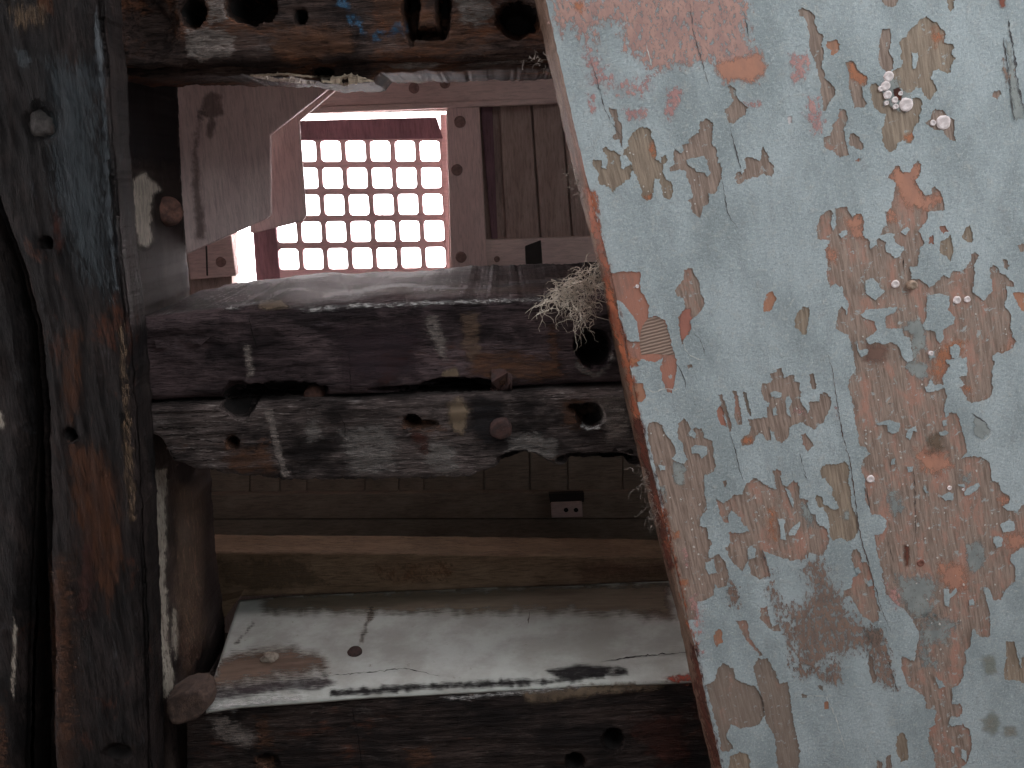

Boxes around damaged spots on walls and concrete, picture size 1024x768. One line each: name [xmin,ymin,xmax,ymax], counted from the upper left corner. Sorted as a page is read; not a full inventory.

damp [128,82,603,310]
peeling [500,0,774,218]
crack [690,5,710,87]
crack [722,130,741,228]
peeling [790,8,956,162]
peeling [609,268,705,393]
peeling [647,161,1024,768]
crack [831,366,916,690]
damp [215,626,664,703]
crack [603,652,686,662]